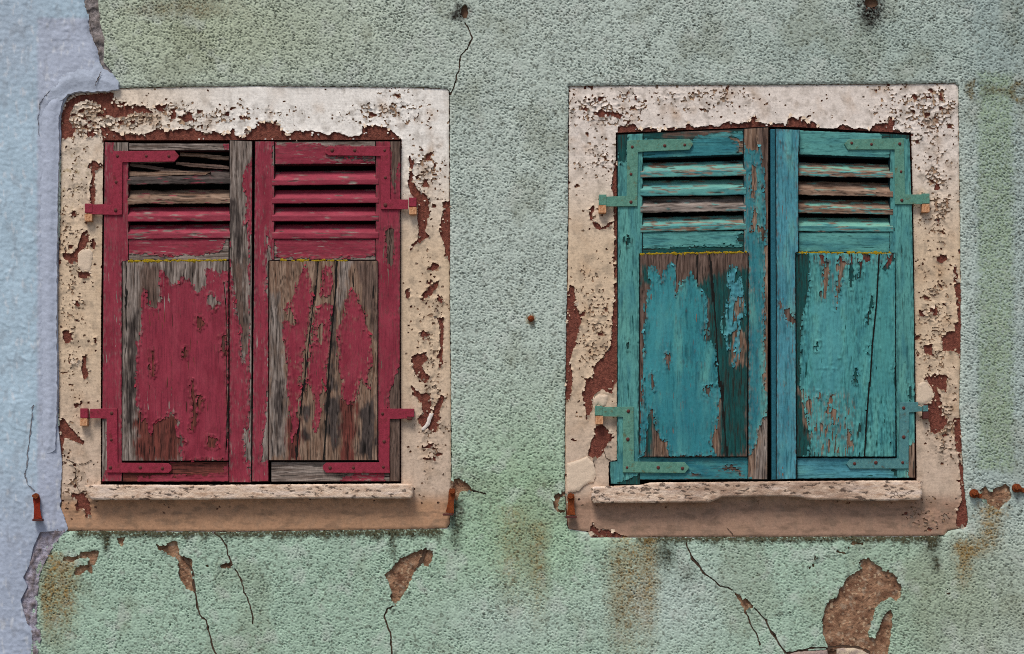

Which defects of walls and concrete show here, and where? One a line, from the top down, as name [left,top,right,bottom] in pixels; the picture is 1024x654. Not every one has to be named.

crack [450,23,473,95]
peeling [61,92,402,143]
peeling [581,97,912,136]
peeling [405,156,451,304]
peeling [551,161,617,513]
peeling [409,317,446,461]
crack [183,556,217,654]
crack [214,532,254,624]
crack [383,606,394,654]
crack [414,548,427,571]
crack [686,542,732,590]
spalling [819,541,902,654]